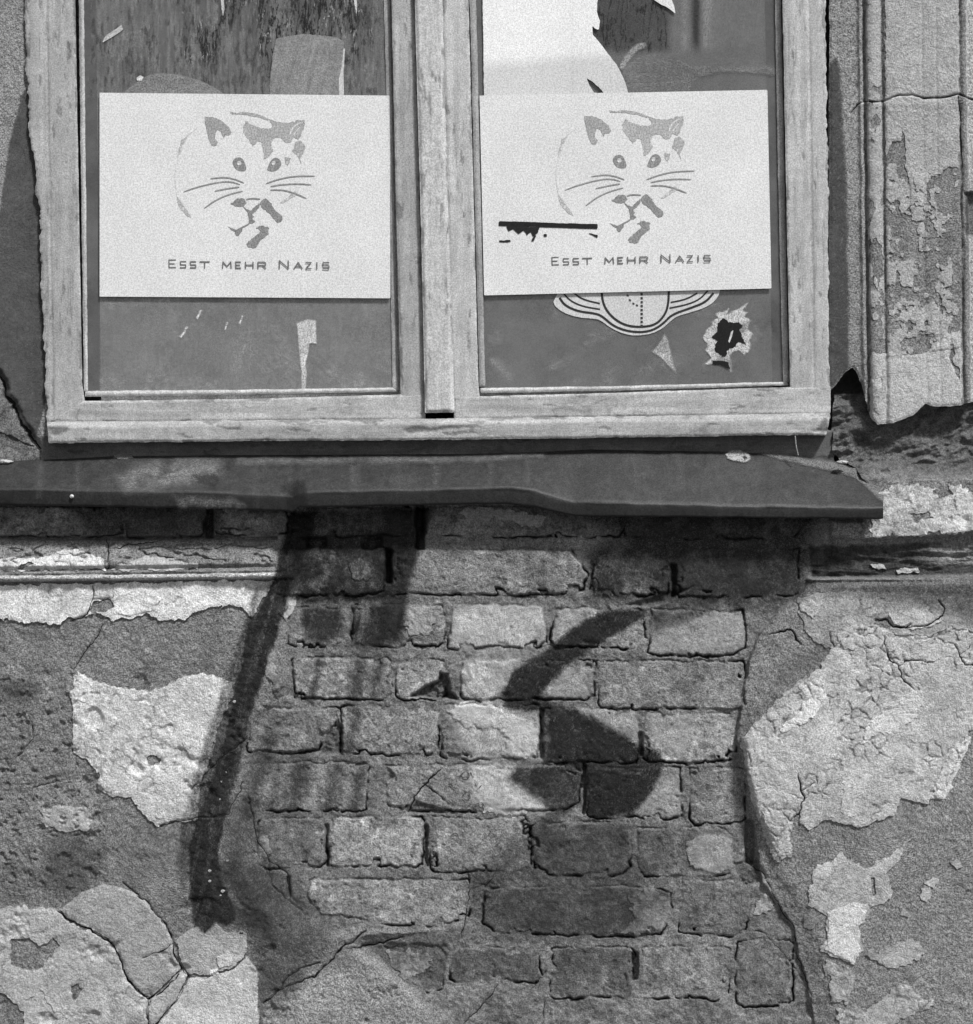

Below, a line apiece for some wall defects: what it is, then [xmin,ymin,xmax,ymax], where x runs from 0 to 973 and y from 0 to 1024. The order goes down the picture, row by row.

crack [850,94,973,167]
peeling [865,0,963,425]
crack [0,376,41,449]
peeling [111,588,161,615]
crack [769,590,973,690]
peeling [73,675,92,702]
peeling [155,785,200,820]
crack [790,778,813,821]
crack [58,886,188,1024]
flaking render [0,884,259,1024]
crack [745,852,812,1009]
peeling [825,902,868,964]